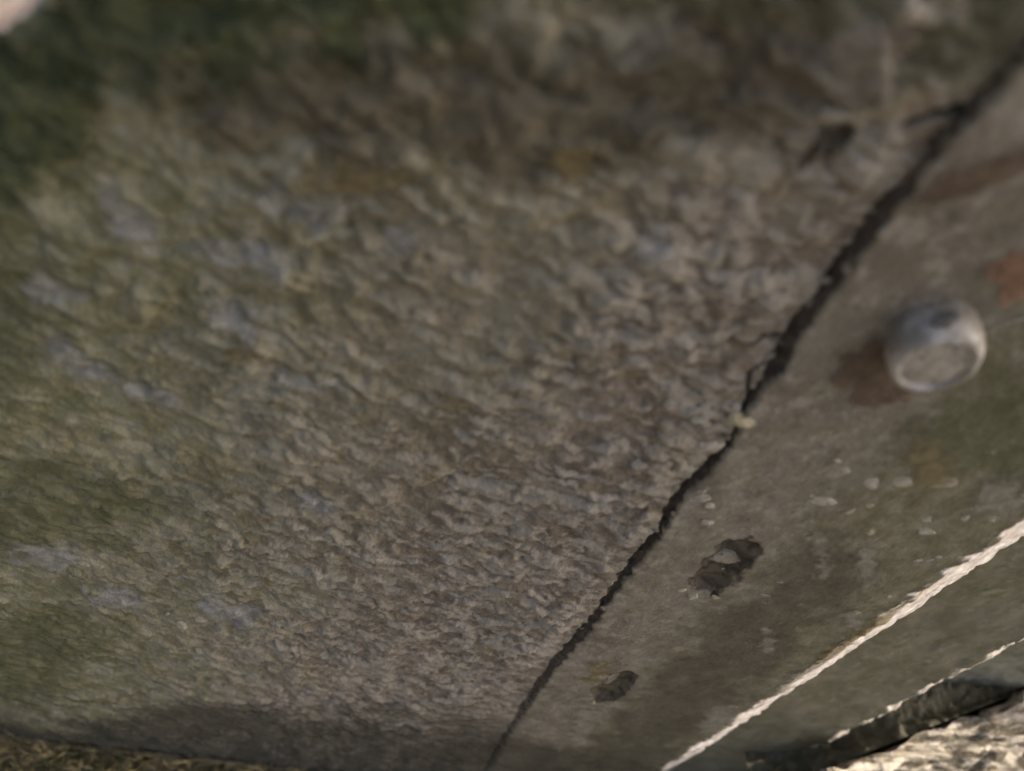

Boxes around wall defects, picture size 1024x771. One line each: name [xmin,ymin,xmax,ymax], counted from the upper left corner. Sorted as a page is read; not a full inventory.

corrosion [834,342,912,407]
crack [484,40,1024,768]
spalling [862,478,878,490]
spalling [892,476,913,487]
spalling [806,495,874,515]
spalling [661,516,1024,771]
spalling [590,671,638,704]